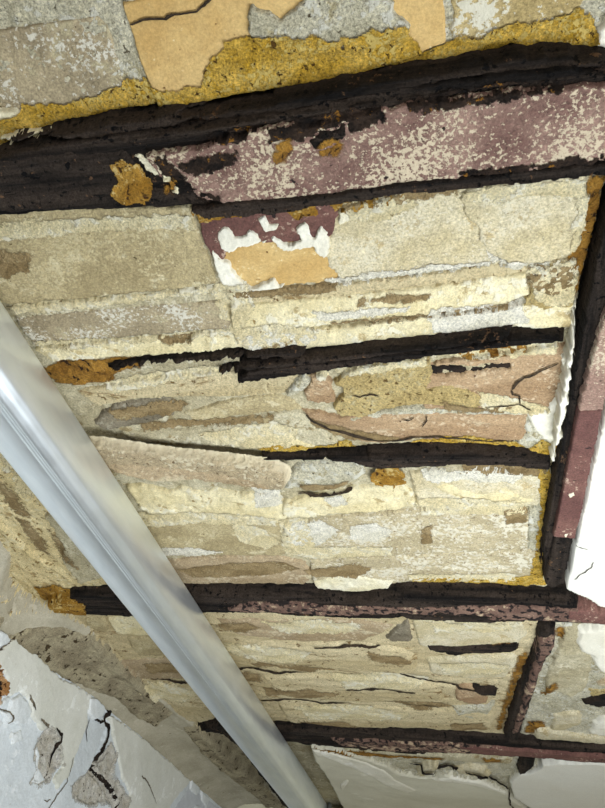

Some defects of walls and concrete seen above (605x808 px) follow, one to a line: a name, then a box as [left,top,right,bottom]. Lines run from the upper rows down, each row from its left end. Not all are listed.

crack [130,0,211,26]
spalling [0,0,605,120]
rust [0,7,605,224]
spalling [0,174,604,592]
rust [44,324,565,385]
rust [34,585,86,616]
spalling [0,453,215,733]
crack [44,710,120,808]
flaking render [0,630,219,808]
spalling [203,612,538,734]
spalling [520,622,605,744]